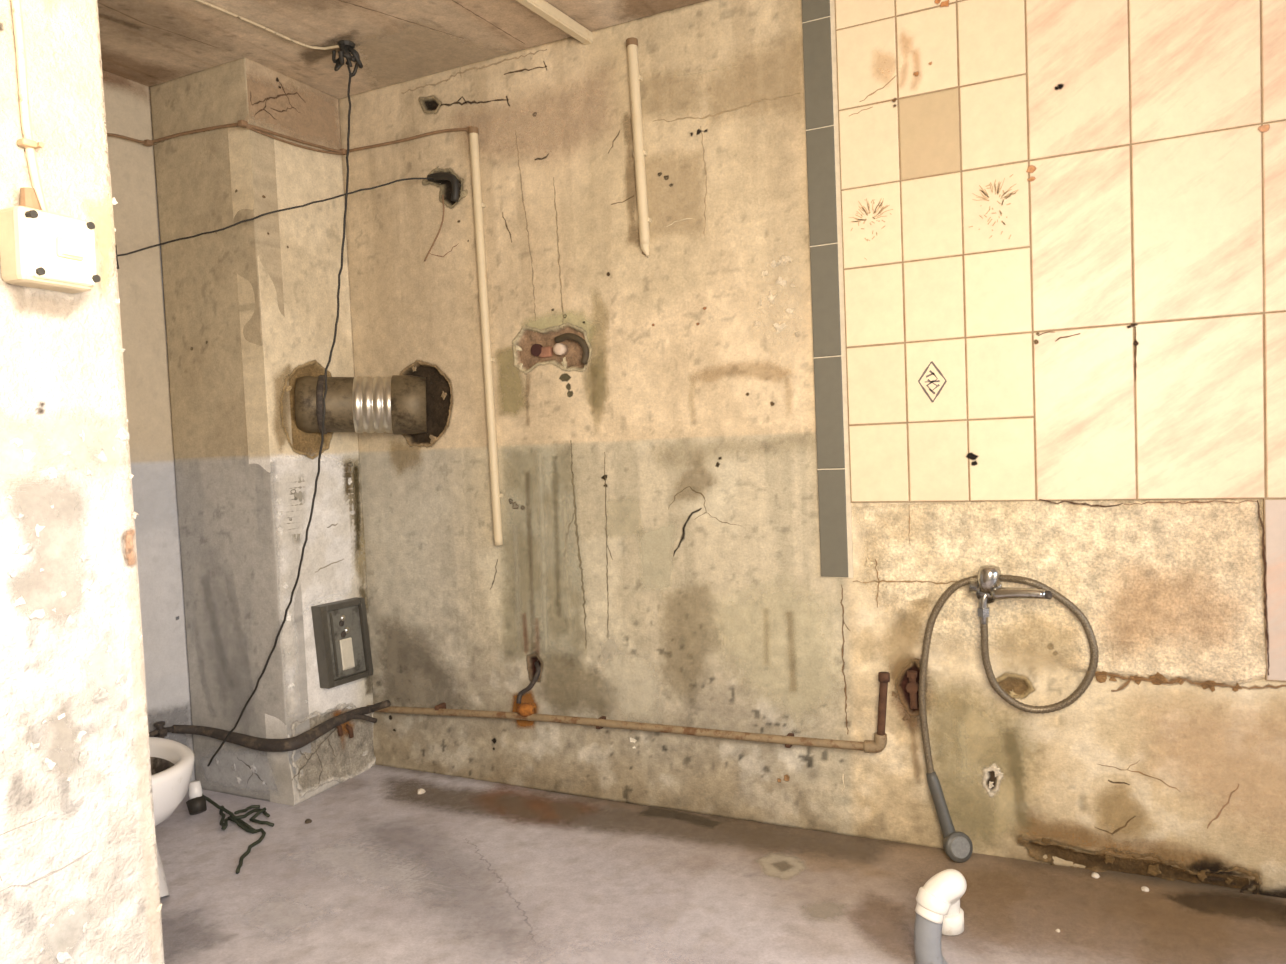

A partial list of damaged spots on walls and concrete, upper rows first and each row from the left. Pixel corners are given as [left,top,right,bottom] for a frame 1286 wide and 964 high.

crack [668,486,740,557]
crack [1039,499,1286,692]
crack [1099,763,1179,791]
crack [1207,784,1239,829]
flaking render [1017,836,1262,894]